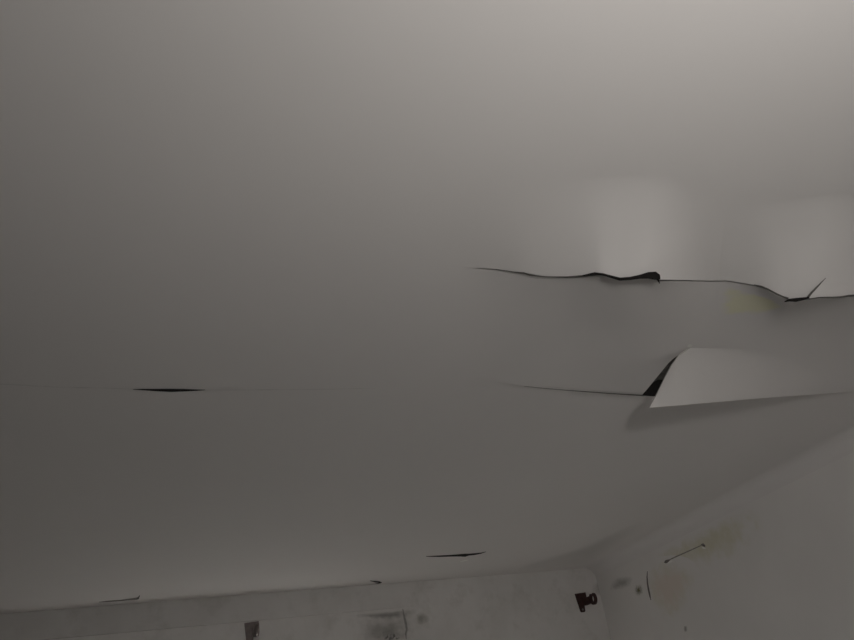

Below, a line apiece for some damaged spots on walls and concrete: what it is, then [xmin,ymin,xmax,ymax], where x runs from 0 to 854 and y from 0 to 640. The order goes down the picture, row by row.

crack [496,269,660,284]
crack [754,278,854,302]
flaking render [462,268,854,408]
crack [0,384,201,392]
crack [526,386,644,396]
crack [426,552,484,562]
crack [646,544,706,600]